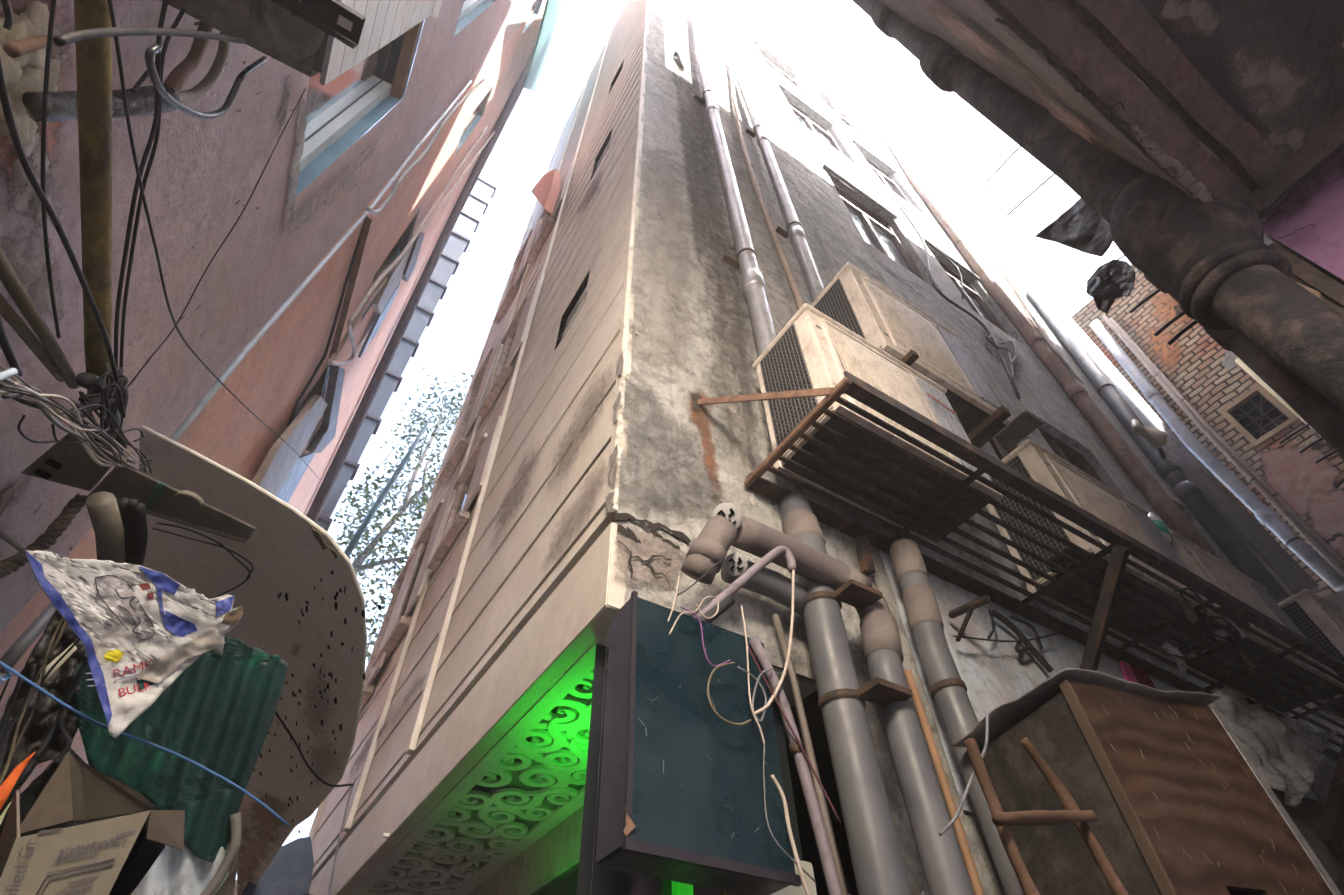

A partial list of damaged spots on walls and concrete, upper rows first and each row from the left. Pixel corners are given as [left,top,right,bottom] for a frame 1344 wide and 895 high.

leakage [674,50,756,505]
crack [615,511,691,581]
corrosion [690,392,719,500]
peeling [1261,439,1344,557]